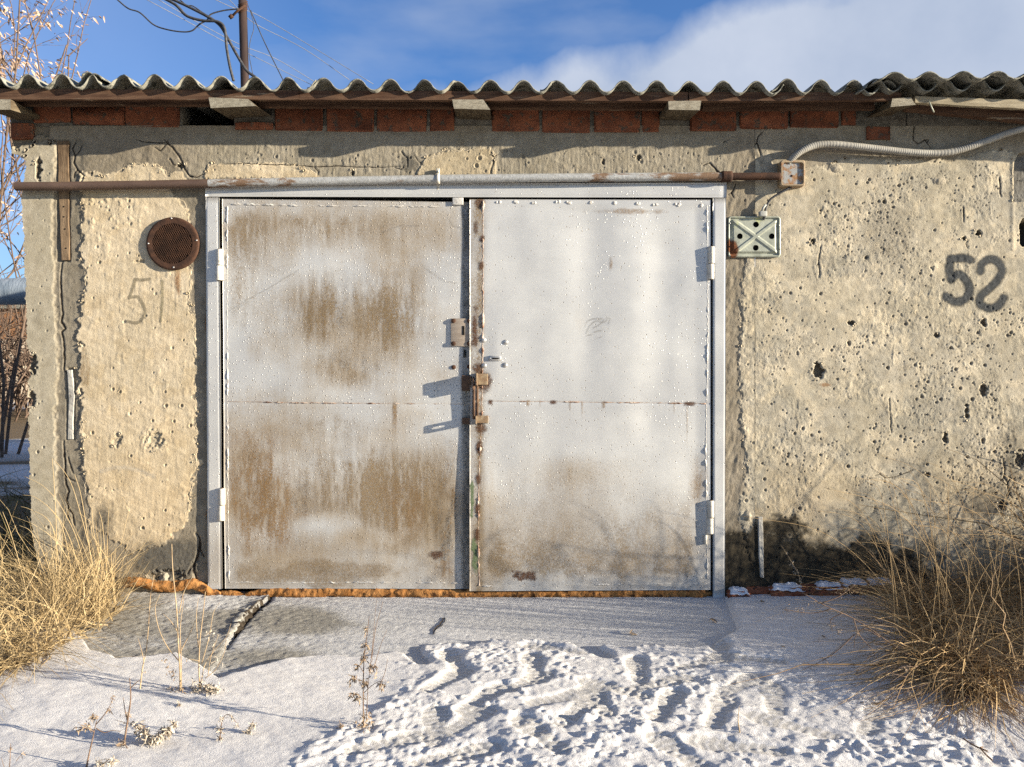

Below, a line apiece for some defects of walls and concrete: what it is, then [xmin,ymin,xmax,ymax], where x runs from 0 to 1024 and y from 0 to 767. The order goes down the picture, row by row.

peeling [20,139,57,181]
corrosion [13,179,209,191]
corrosion [733,172,781,180]
corrosion [300,283,415,348]
spalling [23,350,38,376]
corrosion [470,199,691,591]
corrosion [232,440,307,552]
corrosion [321,452,456,576]
spalling [145,571,186,580]